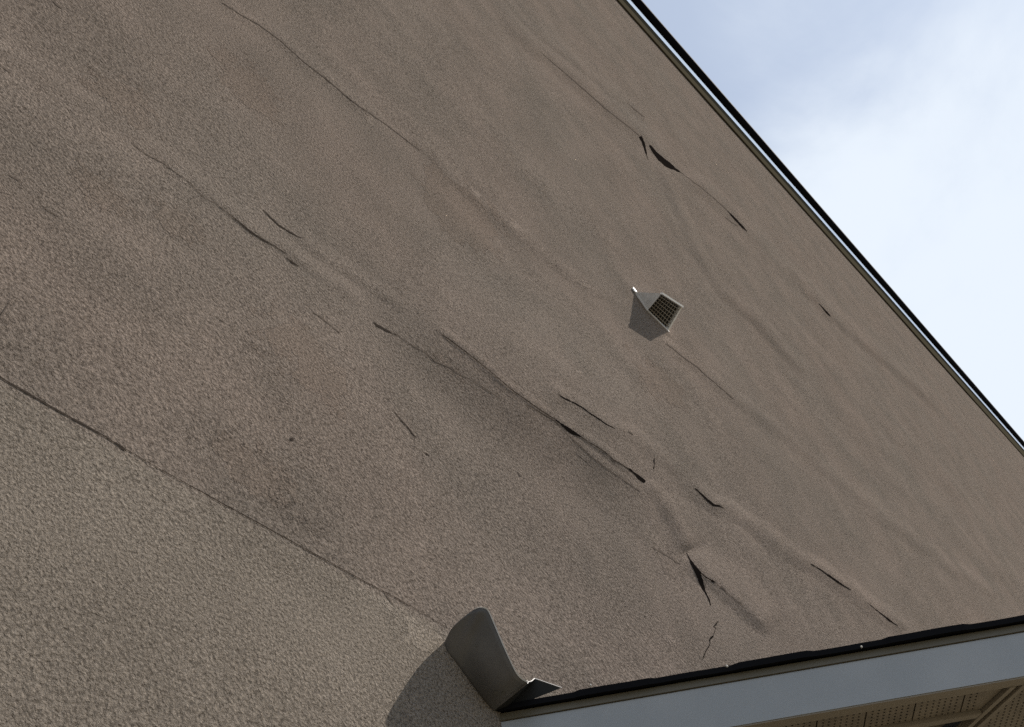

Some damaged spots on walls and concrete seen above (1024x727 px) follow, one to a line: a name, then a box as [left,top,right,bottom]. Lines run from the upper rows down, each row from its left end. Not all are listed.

crack [132,143,301,266]
crack [544,55,747,231]
crack [374,322,655,491]
crack [0,376,446,627]
crack [695,488,724,508]
crack [654,548,742,658]
crack [811,564,898,626]